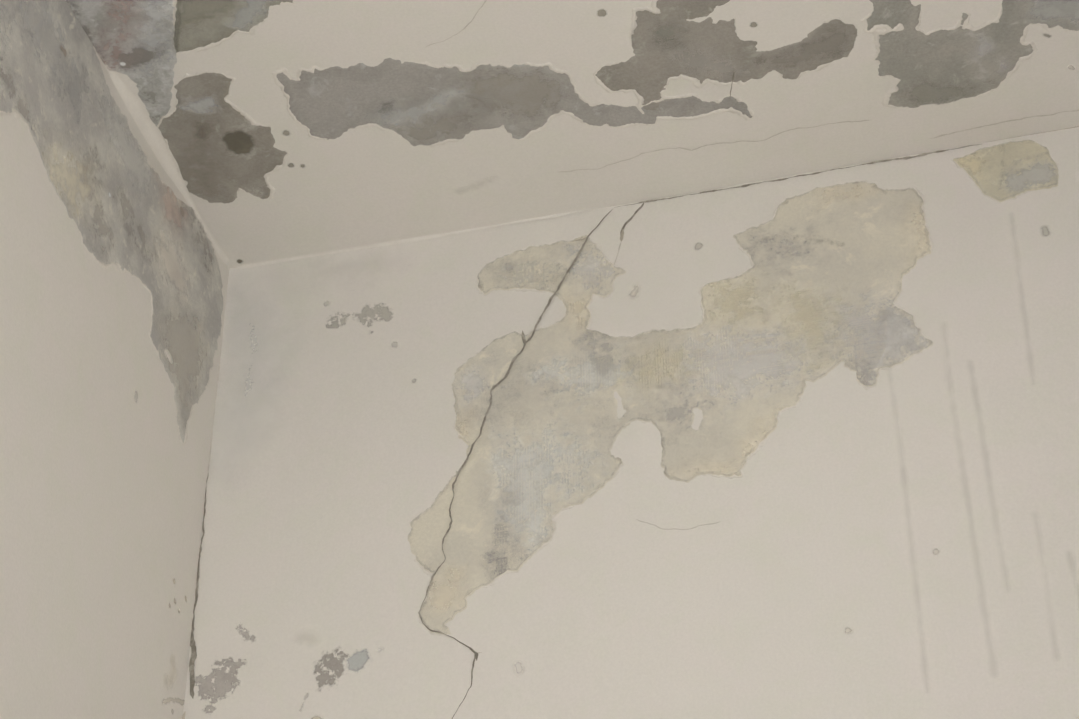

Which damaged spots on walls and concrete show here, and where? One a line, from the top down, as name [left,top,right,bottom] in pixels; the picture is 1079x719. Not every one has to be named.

peeling [0,0,1079,445]
peeling [407,180,935,635]
crack [418,109,1079,719]